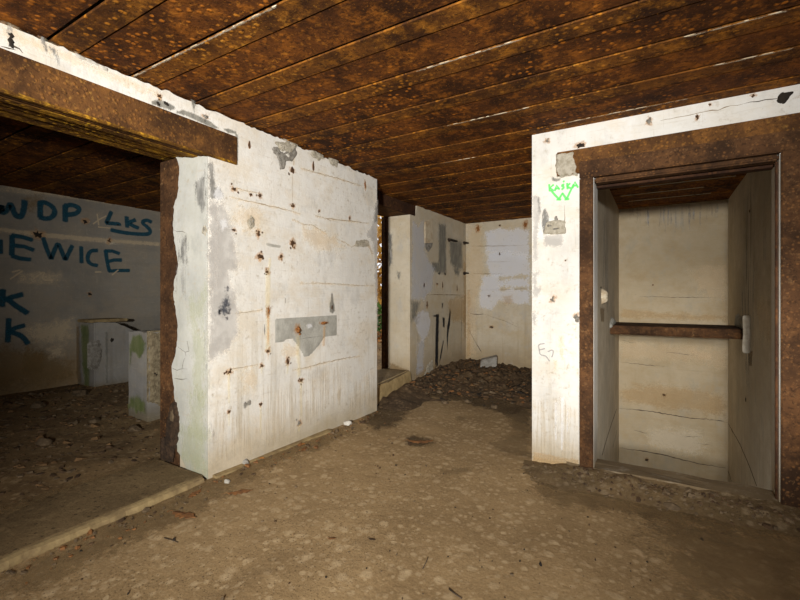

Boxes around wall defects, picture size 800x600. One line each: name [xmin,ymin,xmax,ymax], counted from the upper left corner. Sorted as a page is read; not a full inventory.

spalling [661,91,794,121]
spalling [272,138,298,170]
peeling [479,195,566,310]